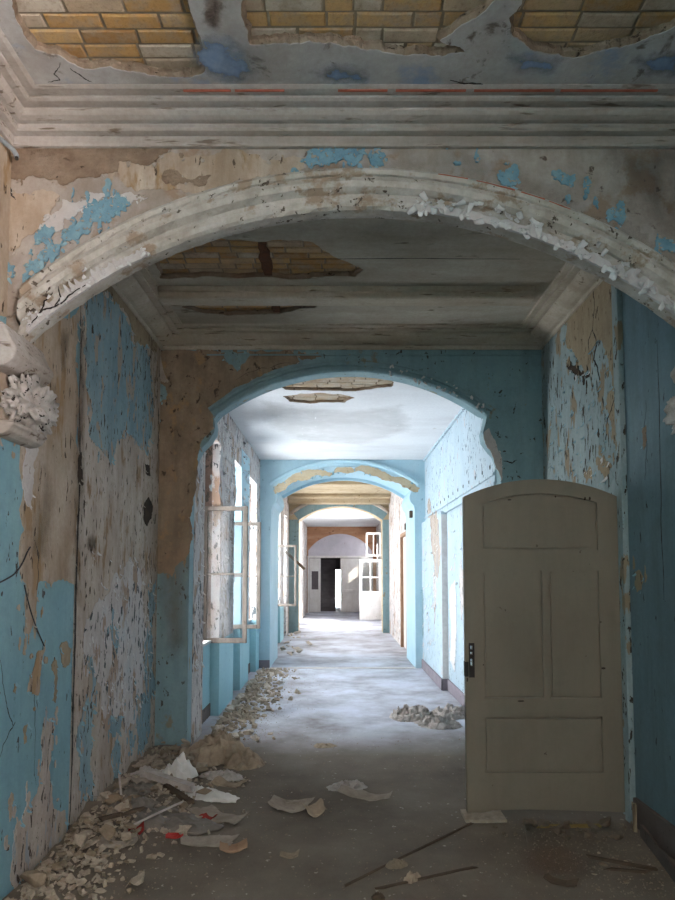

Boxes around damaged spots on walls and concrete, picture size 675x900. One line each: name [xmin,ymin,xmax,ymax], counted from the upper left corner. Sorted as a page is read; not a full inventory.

flaking render [12,0,205,77]
flaking render [241,0,494,56]
flaking render [509,0,675,58]
flaking render [0,134,388,317]
crack [29,285,86,453]
flaking render [282,365,485,414]
peeling [407,191,675,500]
crack [588,291,600,380]
peeling [273,465,420,495]
peeling [4,238,363,889]
crack [68,486,80,830]
crack [0,661,36,756]